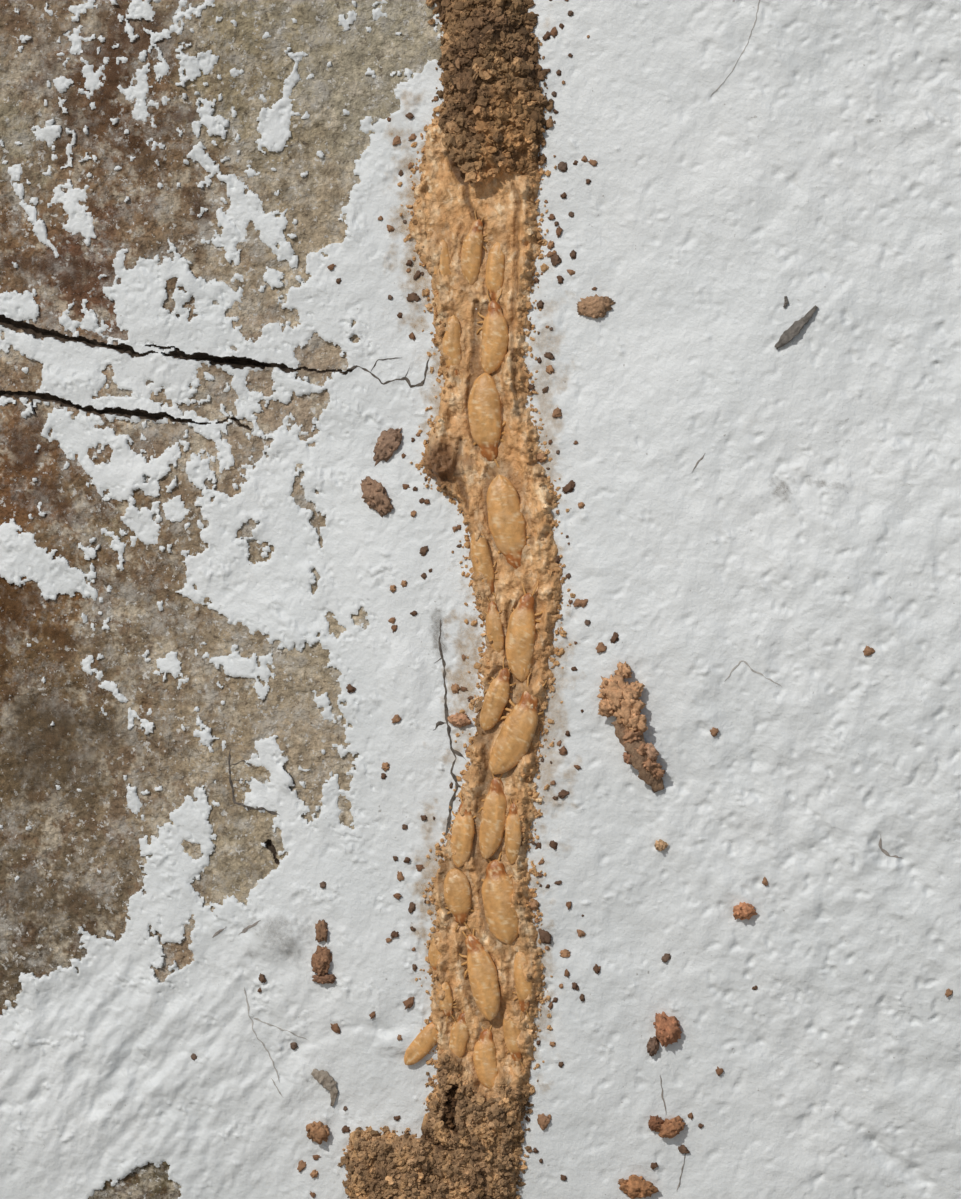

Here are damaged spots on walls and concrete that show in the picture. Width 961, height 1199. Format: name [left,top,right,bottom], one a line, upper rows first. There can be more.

crack [0,314,429,388]
crack [0,390,252,430]
peeling [0,0,443,1015]
peeling [88,1161,181,1199]